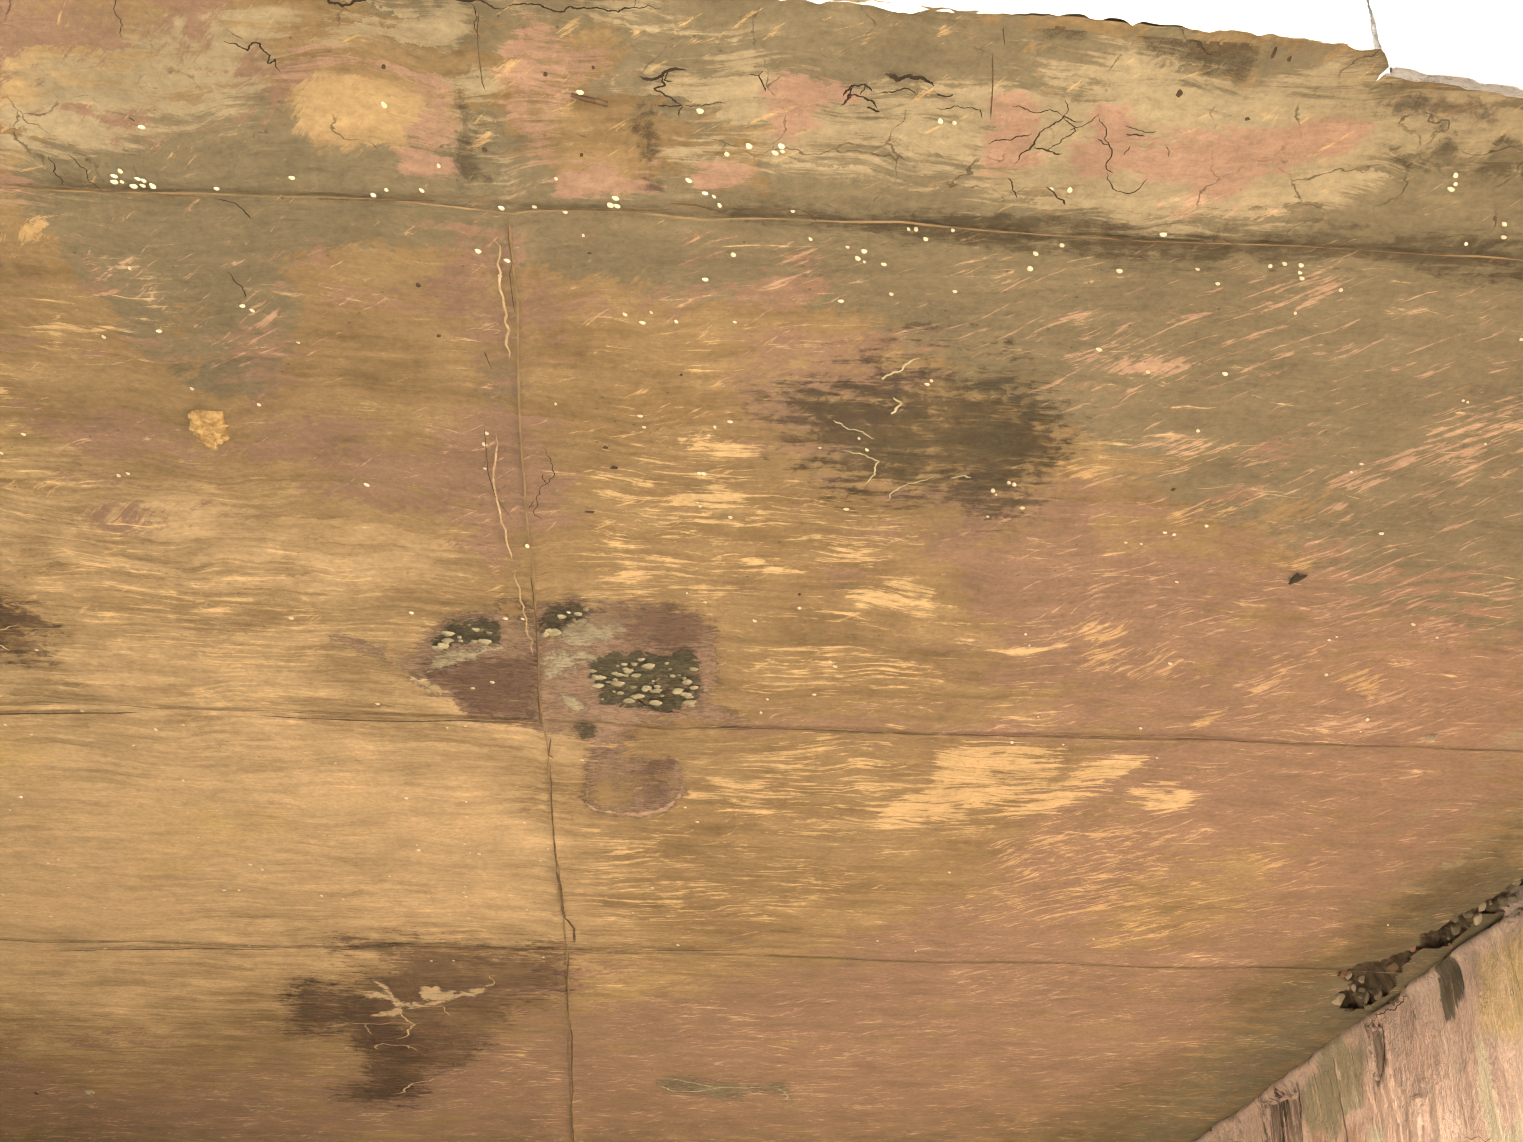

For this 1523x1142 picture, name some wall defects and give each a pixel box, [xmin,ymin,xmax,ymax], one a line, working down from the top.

crack [327,0,366,8]
crack [456,0,660,36]
crack [224,41,280,71]
crack [639,67,722,115]
crack [841,73,1170,205]
crack [48,156,101,190]
crack [529,451,555,517]
water stain [835,421,880,486]
water stain [0,595,57,666]
spalling [1332,878,1523,1027]
water stain [278,928,579,1112]